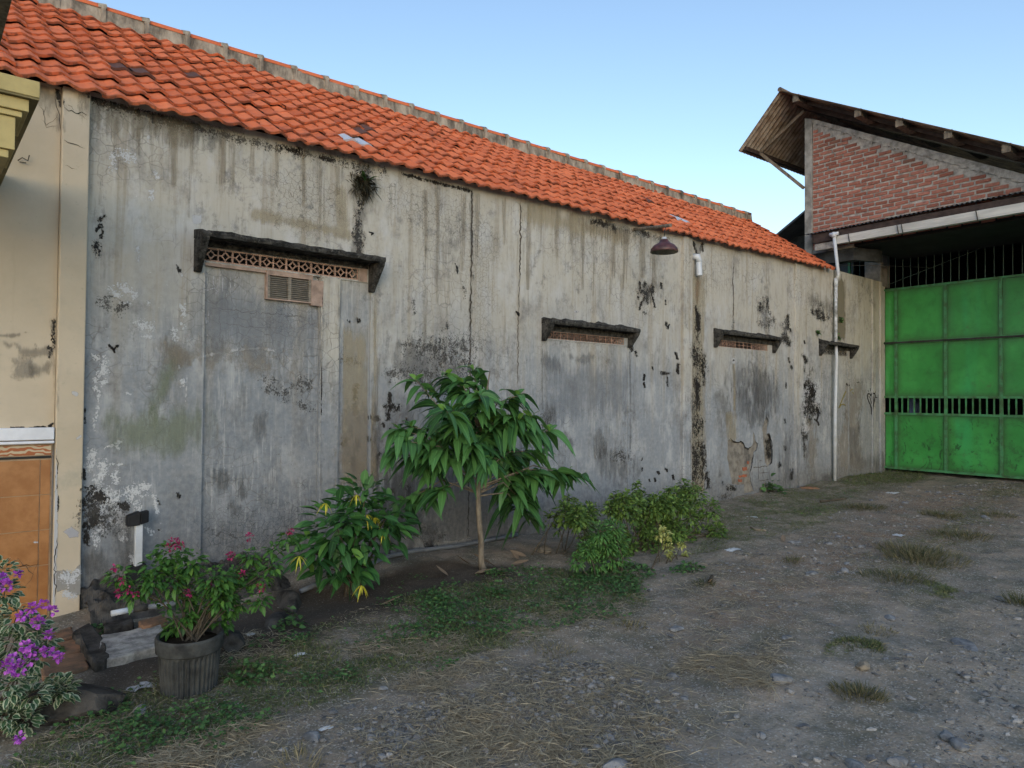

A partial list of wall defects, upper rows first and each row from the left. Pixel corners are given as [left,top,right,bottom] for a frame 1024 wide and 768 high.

water stain [351,197,366,253]
crack [515,202,523,383]
water stain [637,281,667,315]
peeling [50,449,82,605]
water stain [258,367,323,423]
water stain [341,322,477,481]
water stain [690,305,737,499]
flaking render [727,418,773,494]